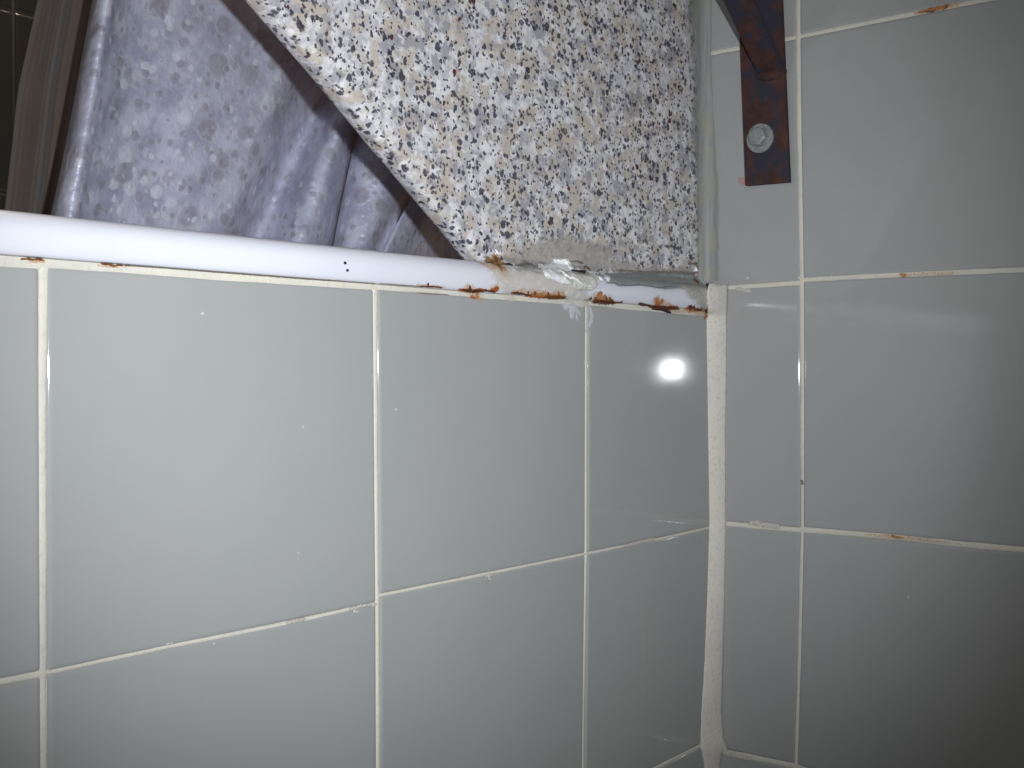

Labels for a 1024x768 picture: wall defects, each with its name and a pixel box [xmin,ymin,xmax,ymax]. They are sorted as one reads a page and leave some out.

corrosion [918,4,949,14]
corrosion [486,255,509,273]
peeling [542,259,573,279]
corrosion [458,285,566,300]
corrosion [586,291,623,305]
corrosion [638,297,708,319]